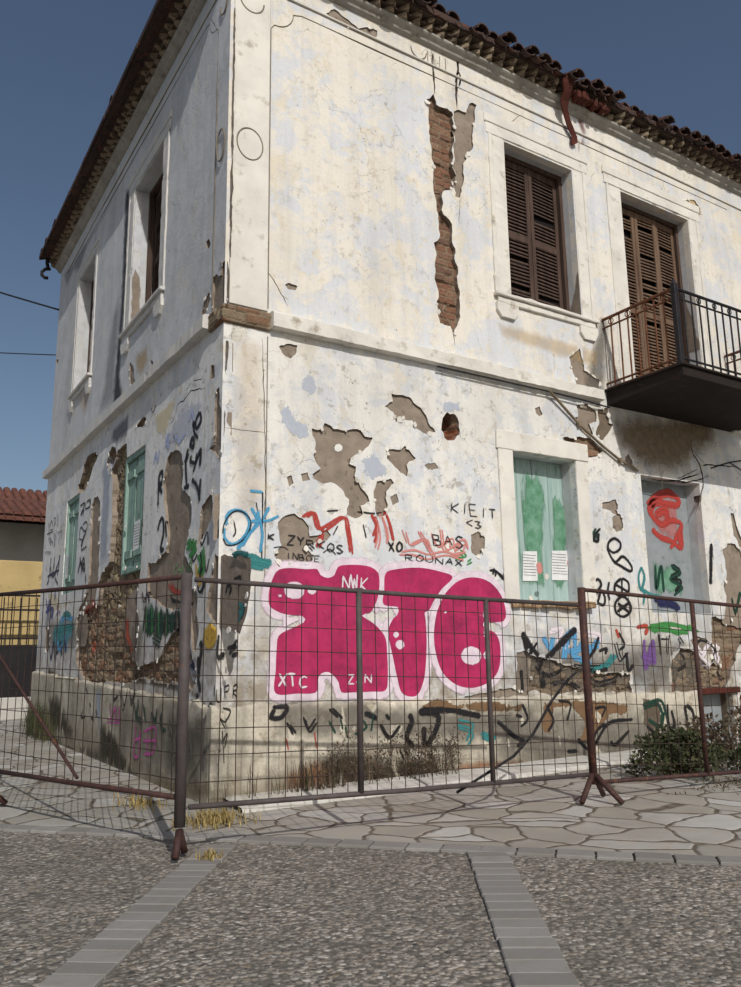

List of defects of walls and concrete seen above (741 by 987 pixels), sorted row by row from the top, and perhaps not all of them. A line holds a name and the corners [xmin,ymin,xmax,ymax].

flaking render [424,98,457,335]
water stain [114,192,129,401]
spalling [427,402,460,440]
peeling [355,447,390,483]
flaking render [563,435,601,462]
flaking render [75,447,180,686]
water stain [49,699,71,735]
water stain [83,728,131,772]